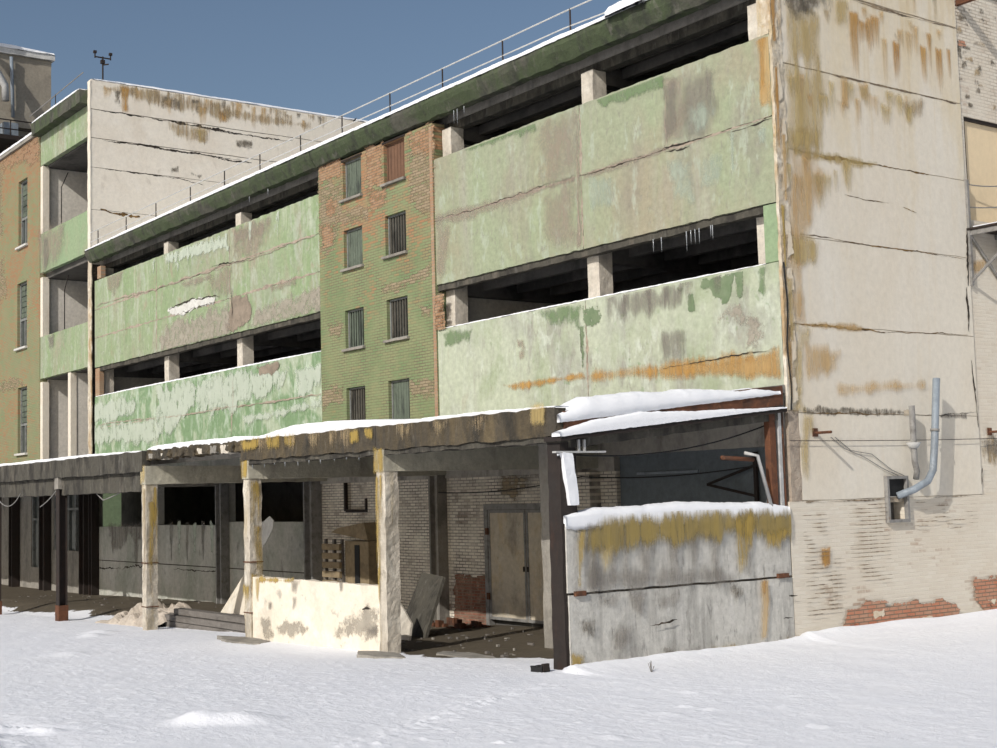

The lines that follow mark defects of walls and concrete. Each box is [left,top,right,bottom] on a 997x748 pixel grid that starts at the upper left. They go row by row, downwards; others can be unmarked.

corrosion [849,9,883,46]
corrosion [915,28,950,74]
crack [102,110,291,185]
crack [794,148,929,175]
crack [100,209,140,218]
corrosion [511,0,850,397]
crack [800,234,970,335]
spalling [159,270,320,350]
spalling [146,439,246,461]
water stain [579,509,792,612]
flaking render [843,598,960,626]
flaking render [973,575,997,610]